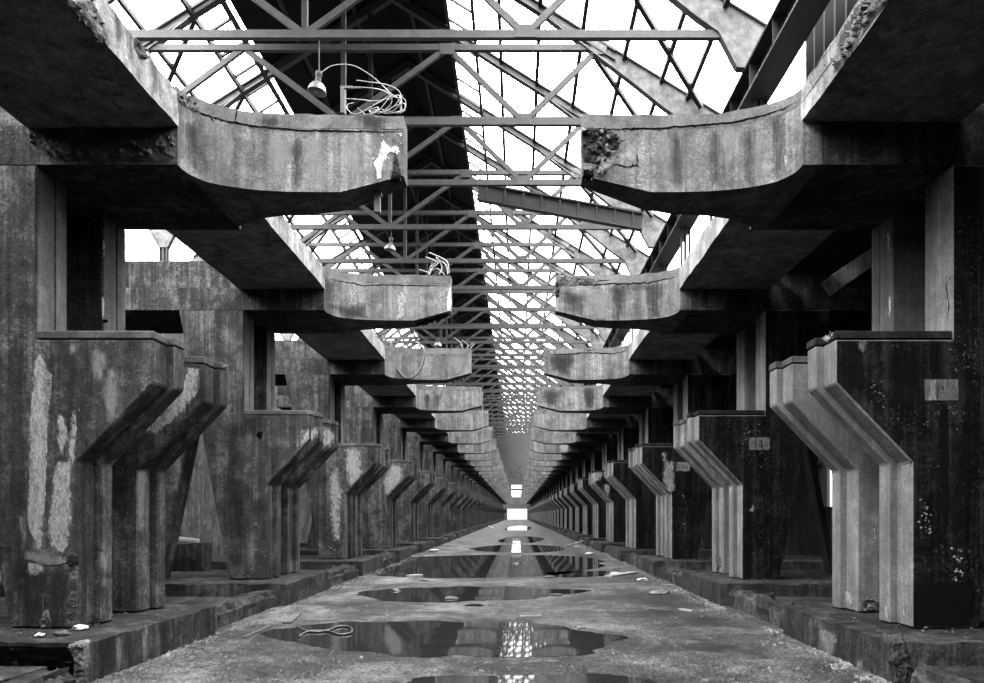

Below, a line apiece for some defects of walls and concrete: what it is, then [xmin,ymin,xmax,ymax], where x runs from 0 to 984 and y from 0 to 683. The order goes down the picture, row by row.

spalling [65,0,110,45]
spalling [134,38,150,60]
spalling [830,0,890,72]
crack [587,34,840,167]
spalling [26,128,176,161]
damp [221,135,235,176]
damp [263,119,323,183]
spalling [372,133,402,183]
spalling [581,127,650,188]
spalling [552,275,594,297]
damp [147,368,200,434]
damp [9,336,118,622]